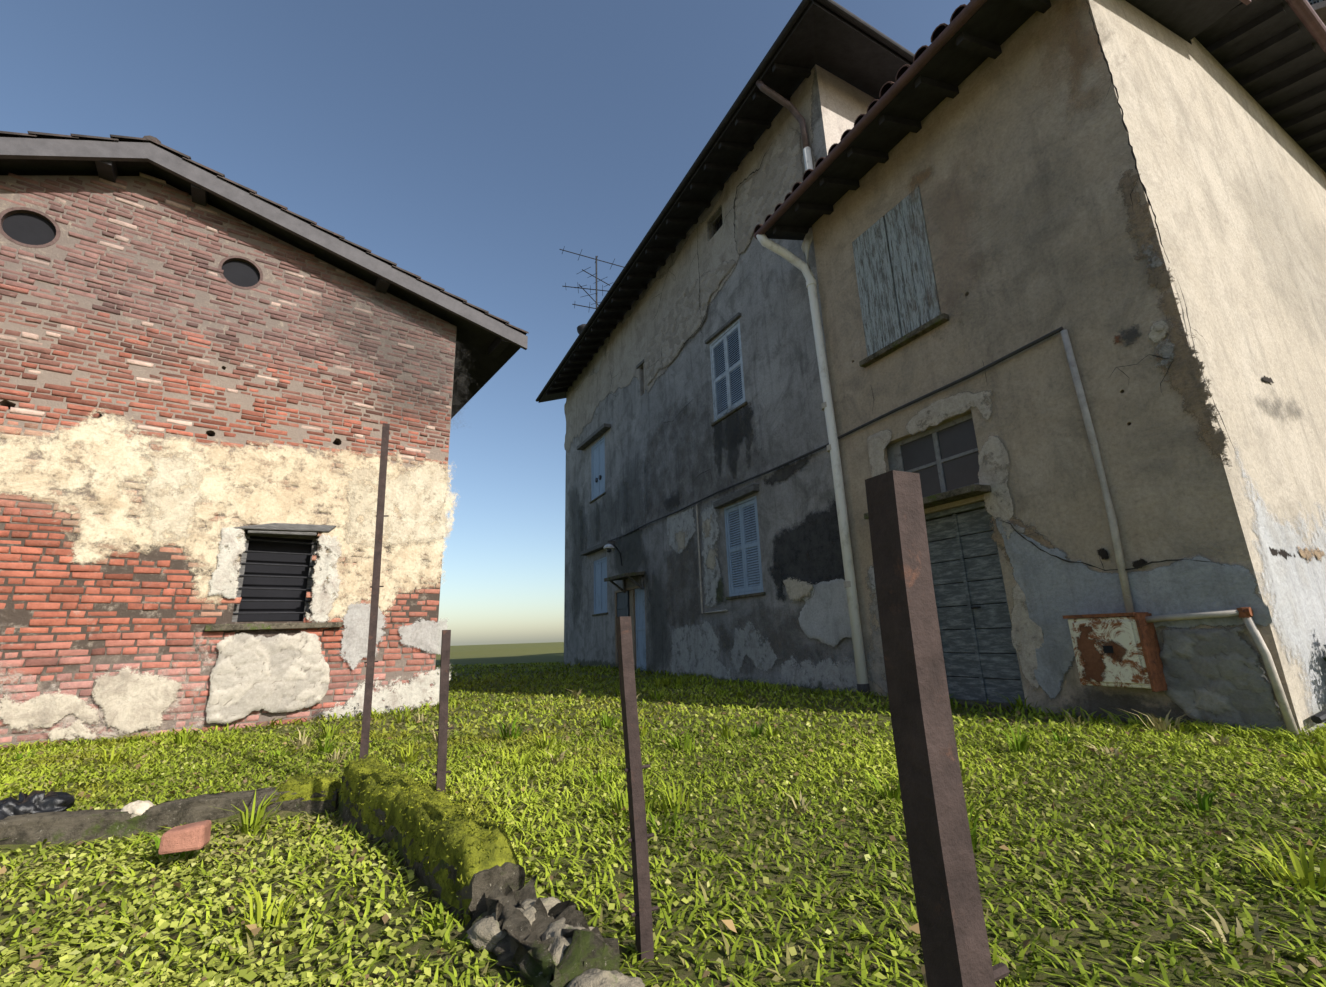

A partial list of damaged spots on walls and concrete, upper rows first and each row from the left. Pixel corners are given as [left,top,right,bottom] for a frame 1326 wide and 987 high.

crack [650,145,771,370]
leakage [649,403,752,512]
flaking render [0,410,457,719]
flaking render [666,505,721,607]
flaking render [0,665,184,742]